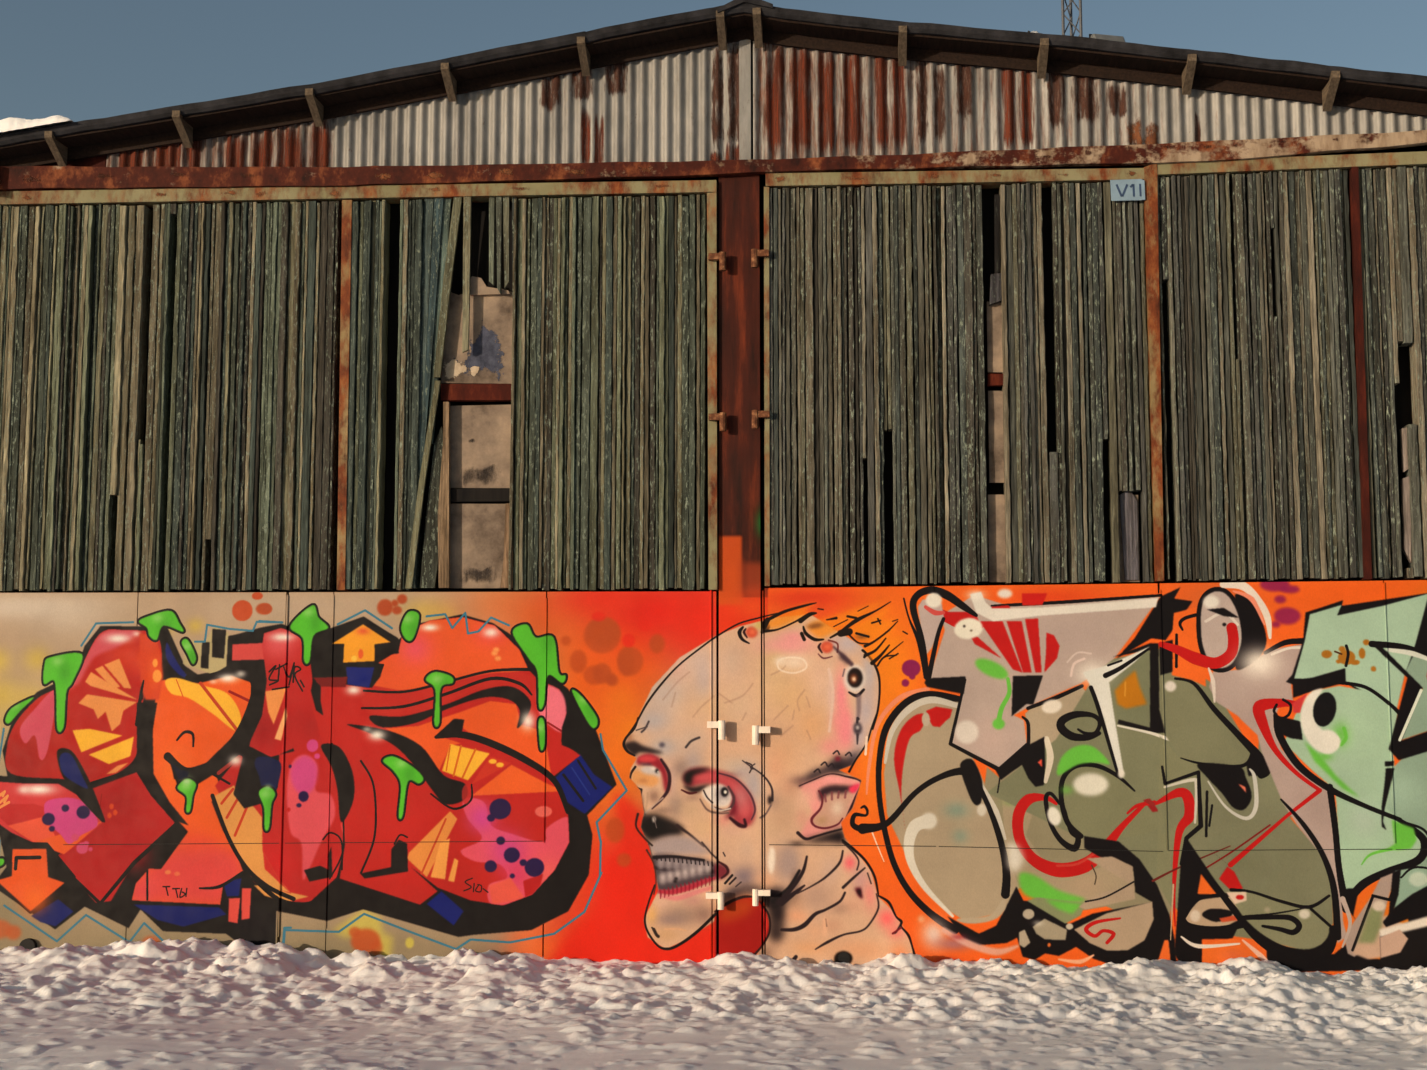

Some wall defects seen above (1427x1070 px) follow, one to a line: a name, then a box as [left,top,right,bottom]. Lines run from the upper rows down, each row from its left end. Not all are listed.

rust [710,44,739,161]
rust [766,45,973,157]
rust [1001,69,1159,148]
rust [95,140,200,178]
rust [226,120,331,196]
peeling [443,320,505,381]